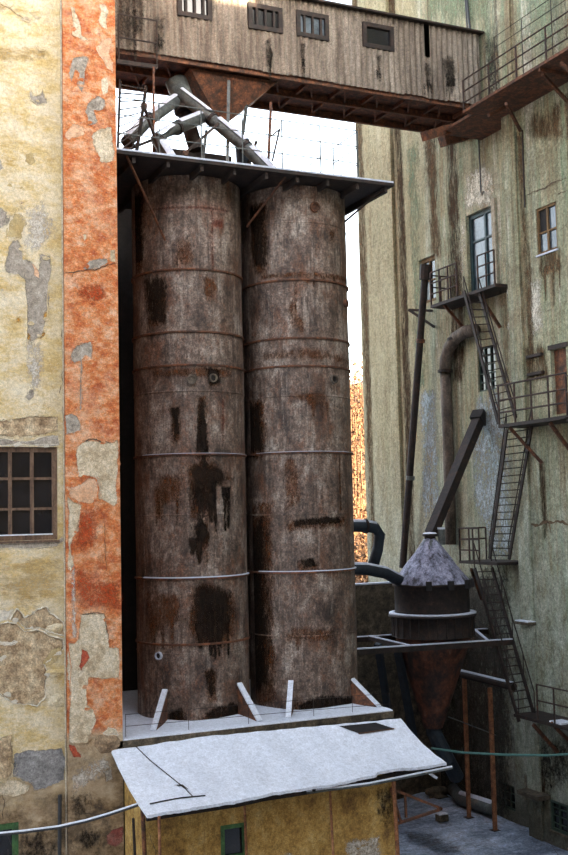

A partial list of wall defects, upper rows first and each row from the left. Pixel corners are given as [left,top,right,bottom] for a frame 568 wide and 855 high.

peeling [65,4,115,163]
peeling [0,201,52,343]
water stain [395,129,493,558]
water stain [516,94,568,385]
peeling [0,340,121,572]
corrosion [154,445,230,565]
peeling [0,606,121,798]